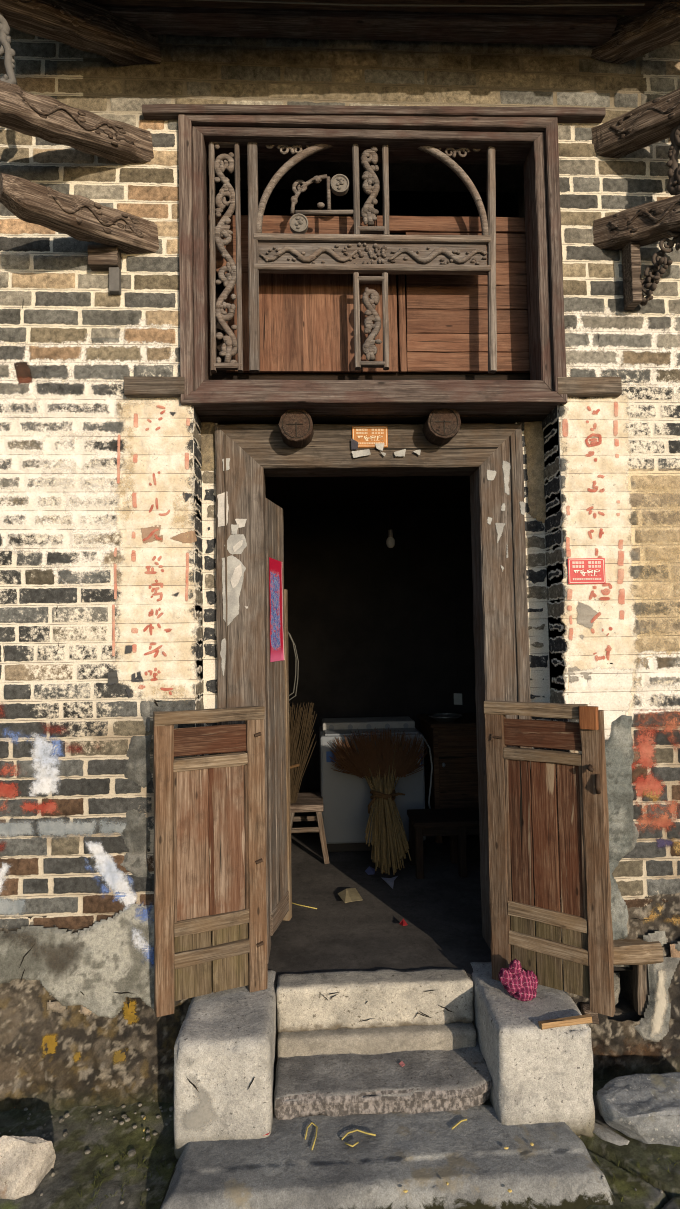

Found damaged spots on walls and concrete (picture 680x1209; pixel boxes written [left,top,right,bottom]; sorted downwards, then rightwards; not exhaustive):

peeling [0,319,200,701]
peeling [560,308,680,743]
flaking render [0,904,154,1018]